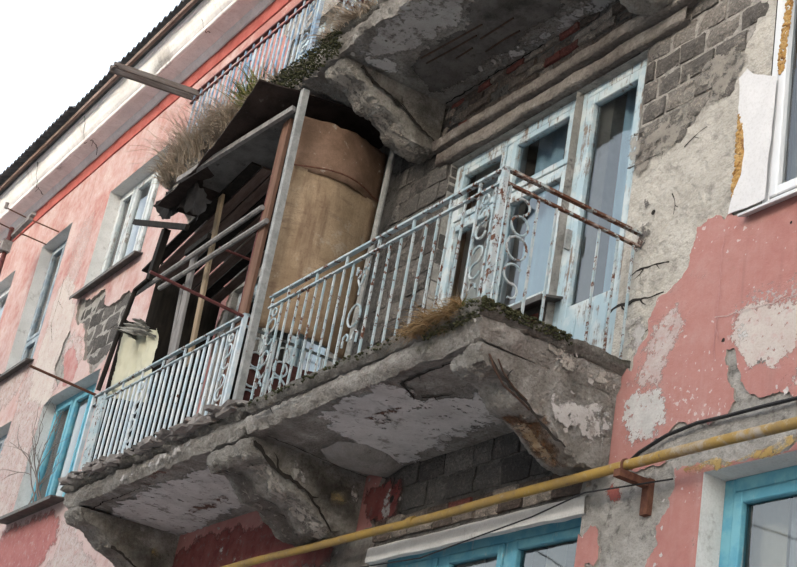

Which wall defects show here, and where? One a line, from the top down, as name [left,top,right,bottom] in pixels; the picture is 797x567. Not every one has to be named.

crack [361,65,435,141]
spalling [350,0,639,137]
crack [610,291,664,320]
crack [632,261,669,278]
spalling [611,0,797,456]
peeling [0,216,134,567]
crack [253,436,366,532]
crack [400,363,452,401]
crack [488,354,566,447]
rust [502,415,564,468]